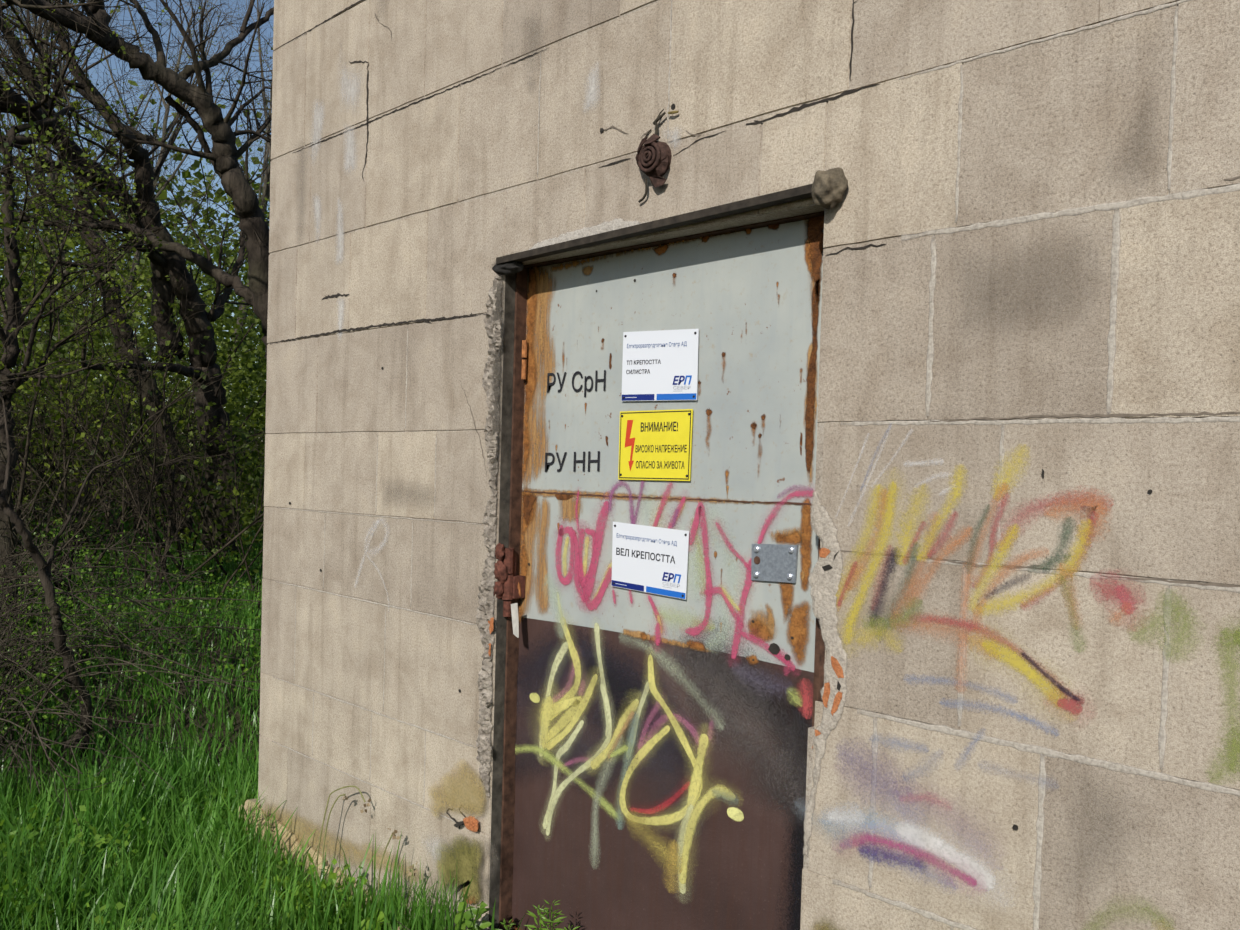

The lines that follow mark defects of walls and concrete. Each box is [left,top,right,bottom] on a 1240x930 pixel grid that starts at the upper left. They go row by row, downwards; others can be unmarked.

crack [599,125,648,168]
crack [673,0,879,156]
flaking render [476,273,503,797]
peeling [511,603,519,638]
rust [519,228,777,618]
rust [740,499,812,663]
rust [800,215,824,481]
flaking render [803,492,847,855]